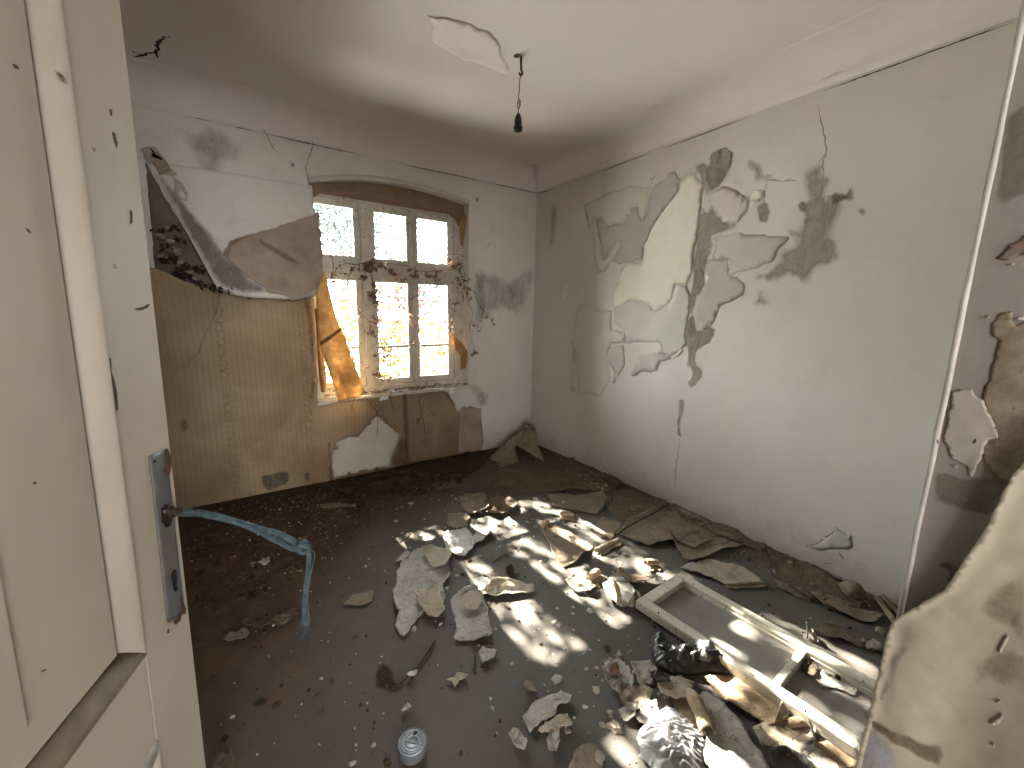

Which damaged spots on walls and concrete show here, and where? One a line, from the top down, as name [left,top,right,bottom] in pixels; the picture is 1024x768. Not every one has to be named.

crack [131,36,170,58]
crack [818,22,1013,178]
peeling [145,162,217,290]
peeling [571,172,790,397]
peeling [332,417,399,477]
peeling [937,311,1024,487]
peeling [806,526,853,551]